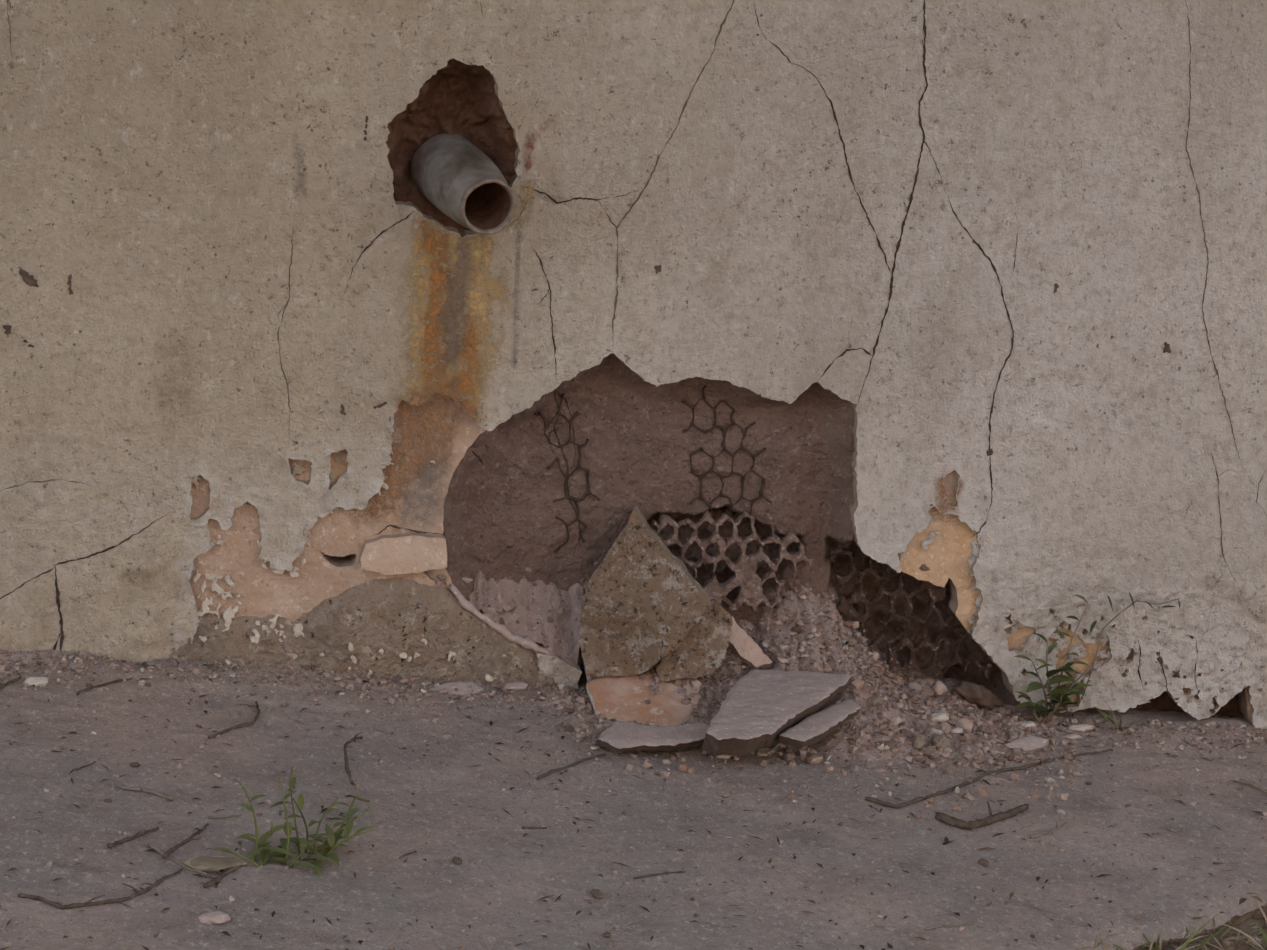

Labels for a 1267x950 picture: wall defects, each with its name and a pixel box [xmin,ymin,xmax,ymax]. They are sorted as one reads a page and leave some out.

spalling [386,58,518,233]
crack [345,211,414,292]
crack [504,0,1019,552]
crack [1185,0,1267,578]
crack [371,525,445,537]
spalling [169,353,1028,709]
peeling [993,601,1111,705]
peeling [1121,640,1137,693]
peeling [1156,642,1197,697]
peeling [1238,688,1252,721]